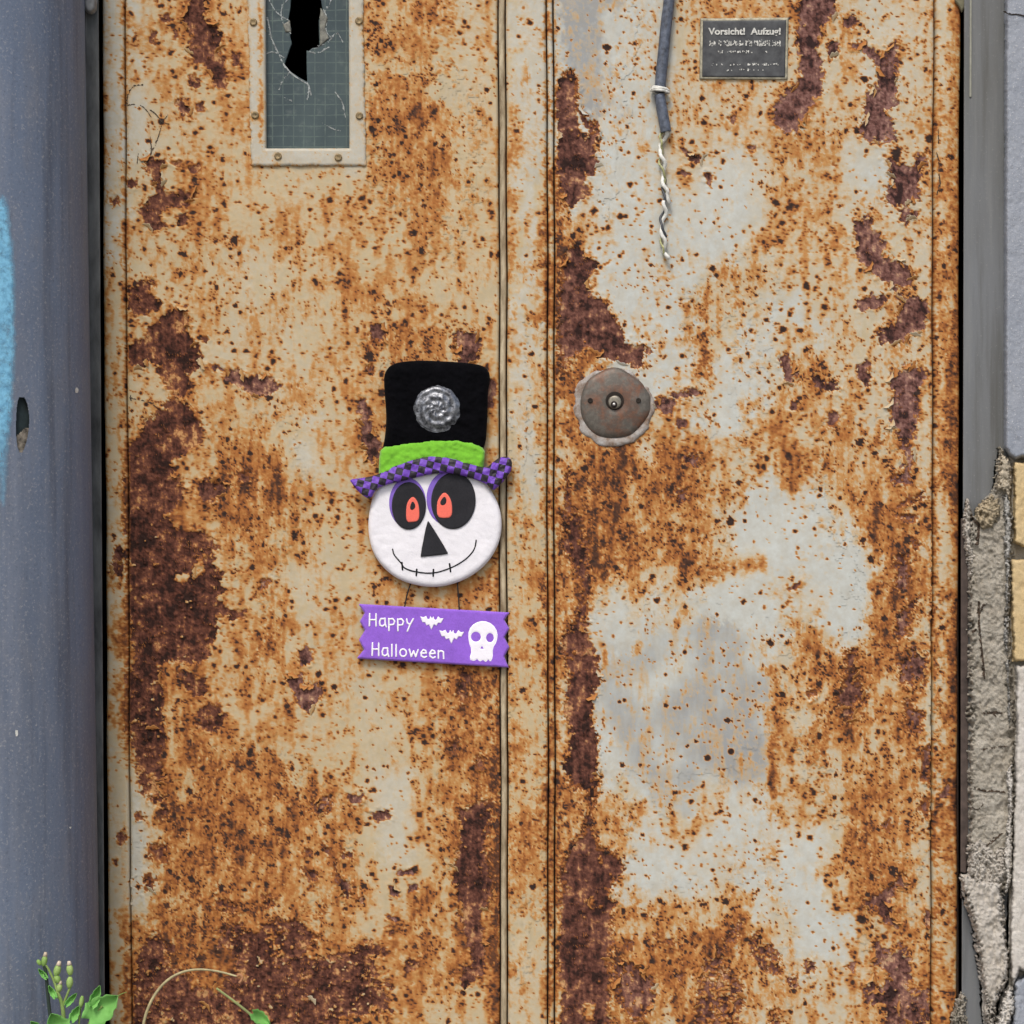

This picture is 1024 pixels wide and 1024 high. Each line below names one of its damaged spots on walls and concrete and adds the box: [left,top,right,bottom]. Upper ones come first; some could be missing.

corrosion [202,399,315,614]
corrosion [357,319,461,393]
corrosion [354,38,492,262]
corrosion [426,180,799,1024]
peeling [772,0,859,134]
corrosion [769,410,955,951]
peeling [852,40,899,145]
peeling [853,214,931,346]
peeling [883,360,927,523]
peeling [885,152,928,226]
spalling [962,447,1016,896]
corrosion [131,731,371,976]